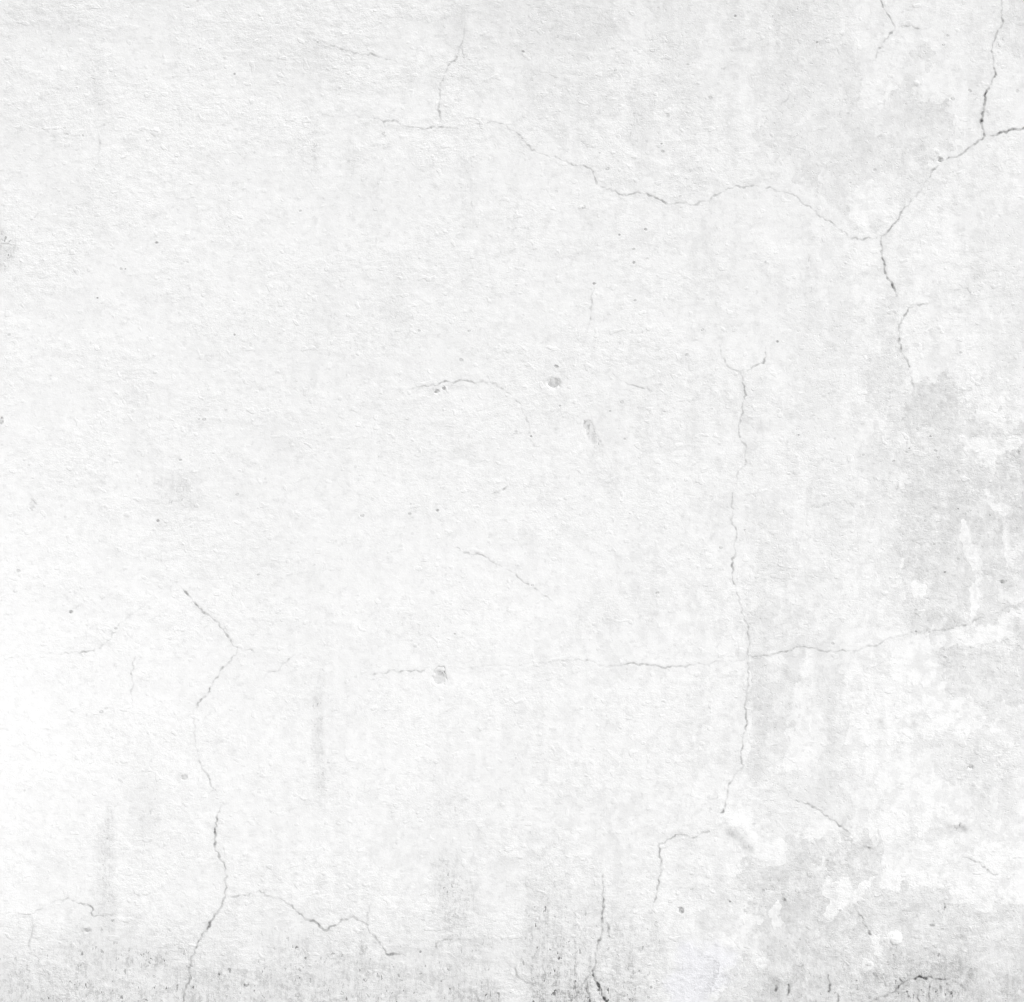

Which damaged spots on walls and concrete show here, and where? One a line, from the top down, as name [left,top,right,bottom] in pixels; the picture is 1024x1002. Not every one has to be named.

crack [312,0,1024,397]
crack [0,894,124,989]
crack [173,581,416,1002]
crack [364,665,440,680]
crack [444,541,559,609]
crack [648,335,1024,915]